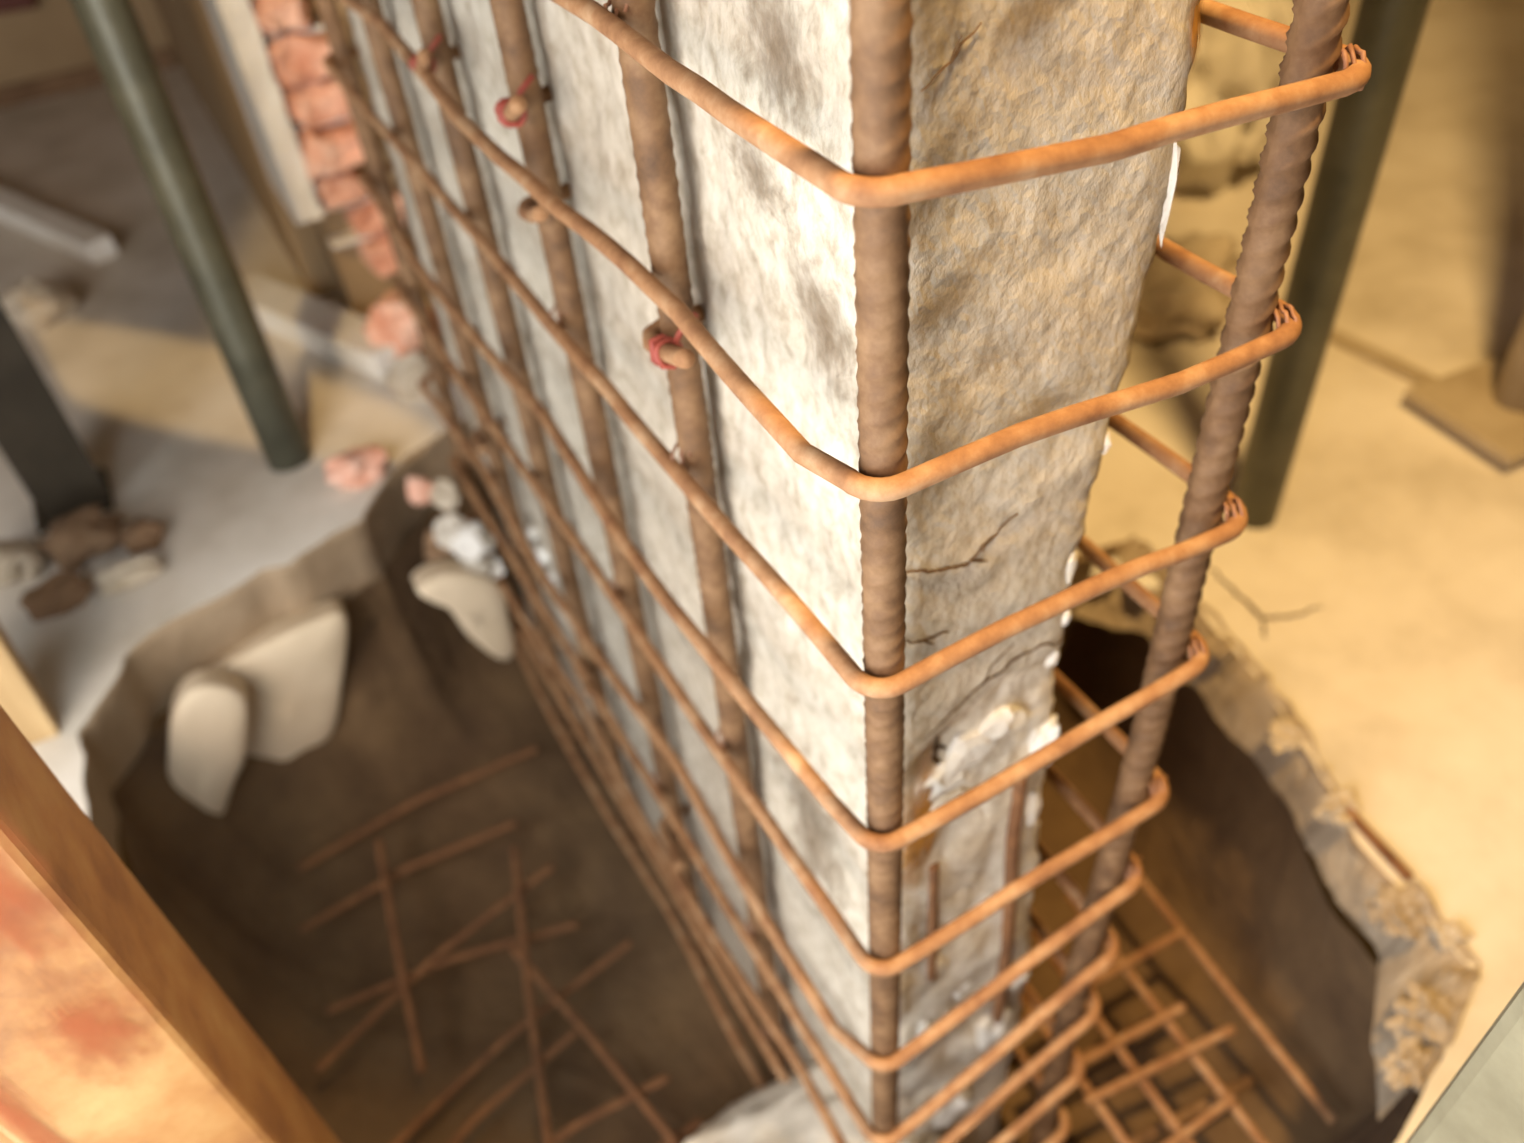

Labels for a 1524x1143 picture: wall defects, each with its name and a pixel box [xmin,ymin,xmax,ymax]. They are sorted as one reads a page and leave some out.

spalling [249,0,643,850]
spalling [489,0,711,970]
spalling [657,306,789,1083]
spalling [848,0,914,177]
spalling [853,203,912,477]
spalling [859,497,908,678]
spalling [863,694,1060,834]
spalling [1159,142,1181,246]
spalling [926,547,1482,1143]
spalling [1174,361,1262,545]
spalling [1216,102,1326,356]
spalling [867,849,934,1133]